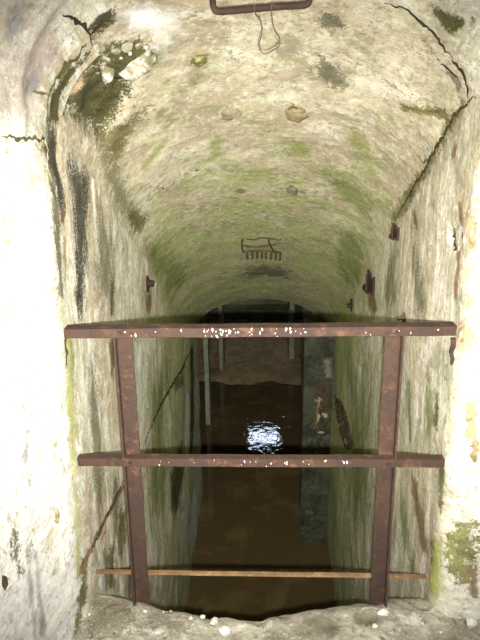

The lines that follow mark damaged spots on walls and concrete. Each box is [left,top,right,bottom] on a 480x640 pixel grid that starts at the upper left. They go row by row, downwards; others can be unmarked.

crack [2,15,102,180]
water stain [46,112,119,321]
flaking render [93,35,158,85]
crack [384,3,476,223]